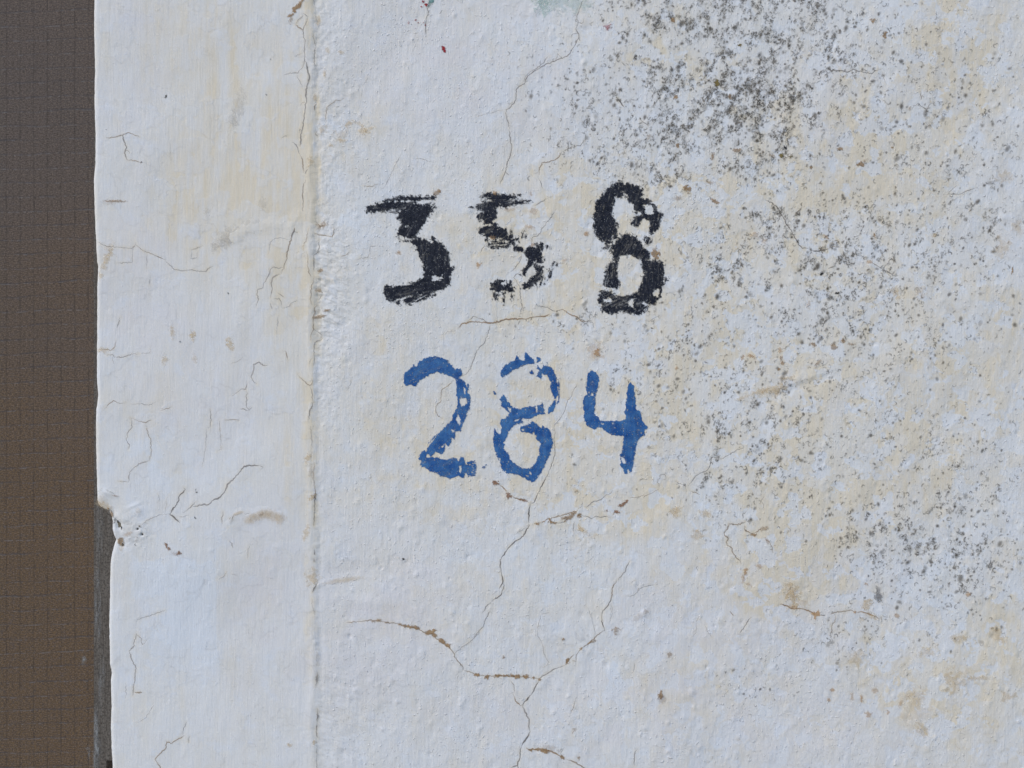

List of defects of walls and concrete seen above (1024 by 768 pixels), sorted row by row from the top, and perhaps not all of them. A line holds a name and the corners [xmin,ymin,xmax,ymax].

crack [481,1,584,181]
damp [582,0,897,345]
crack [435,141,593,415]
crack [108,400,169,482]
crack [203,353,287,461]
damp [681,399,804,488]
crack [145,465,263,547]
crack [350,387,740,768]
damp [835,486,960,580]
damp [951,509,996,592]